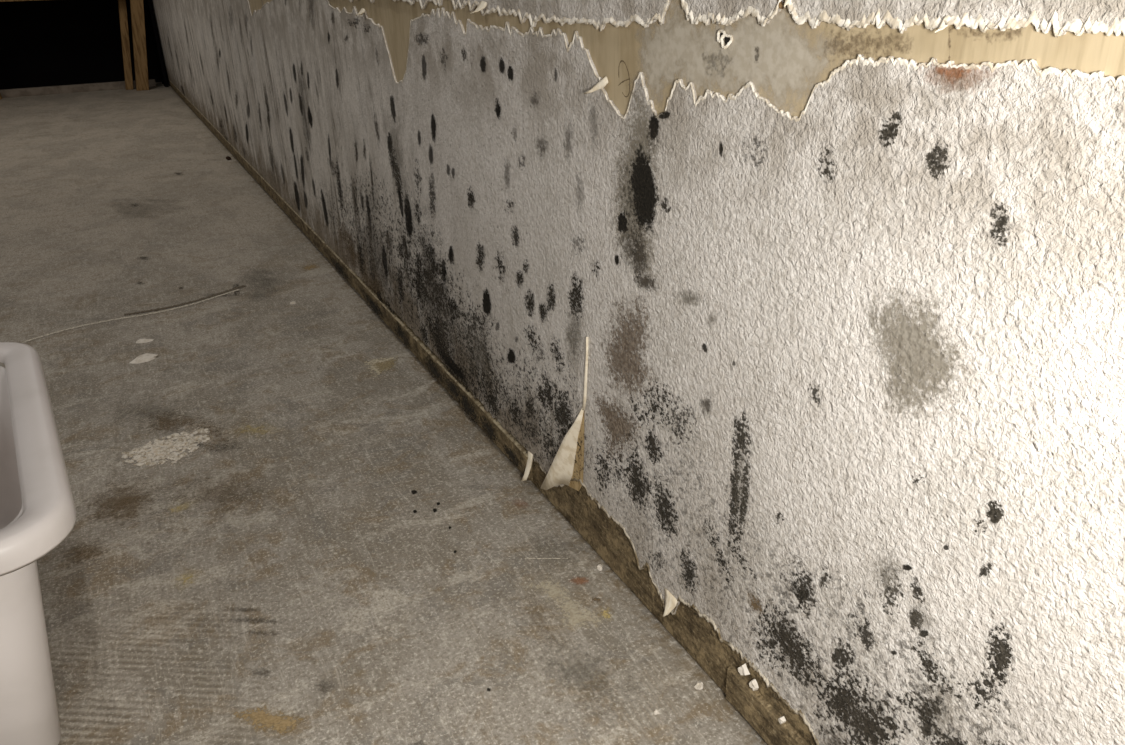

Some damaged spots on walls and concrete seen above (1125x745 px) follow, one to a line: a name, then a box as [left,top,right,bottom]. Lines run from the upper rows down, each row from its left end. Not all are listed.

water stain [211,79,270,156]
peeling [327,0,1125,122]
water stain [926,143,951,180]
water stain [283,3,902,540]
water stain [990,203,1010,247]
water stain [866,292,970,417]
peeling [510,337,819,745]
water stain [705,411,757,586]
water stain [974,501,1004,532]
water stain [748,563,1013,745]